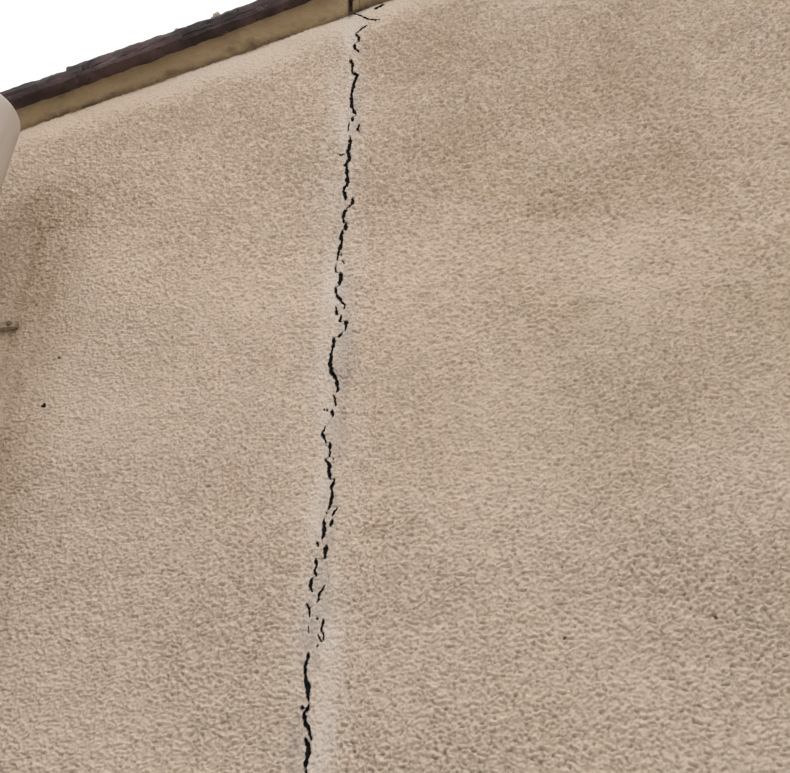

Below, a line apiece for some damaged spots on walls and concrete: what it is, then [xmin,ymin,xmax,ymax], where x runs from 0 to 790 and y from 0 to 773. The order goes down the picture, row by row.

crack [301,0,384,773]